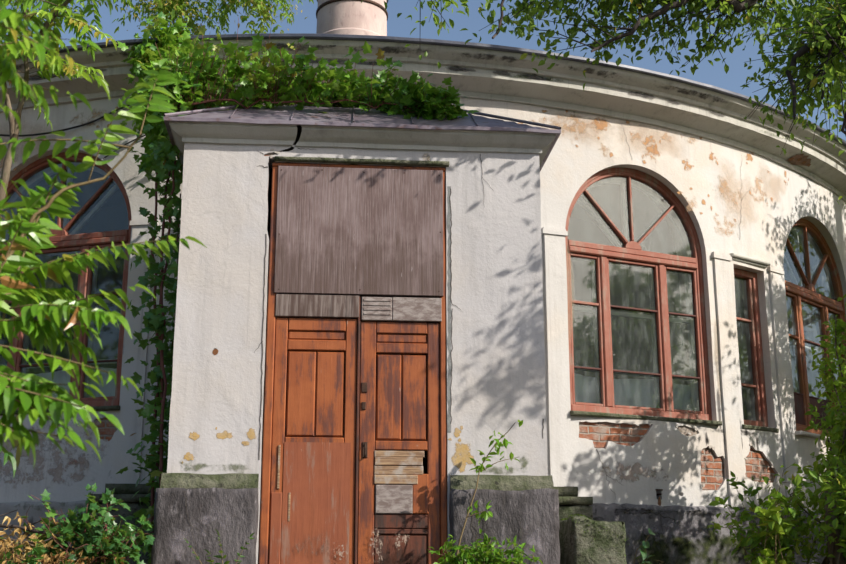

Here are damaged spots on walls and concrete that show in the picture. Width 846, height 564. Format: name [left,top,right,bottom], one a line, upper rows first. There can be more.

crack [257,126,316,168]
peeling [556,110,614,157]
peeling [626,120,666,164]
peeling [0,415,118,483]
peeling [448,426,474,472]
spalling [579,422,651,449]
spalling [701,445,724,491]
spalling [744,443,776,483]